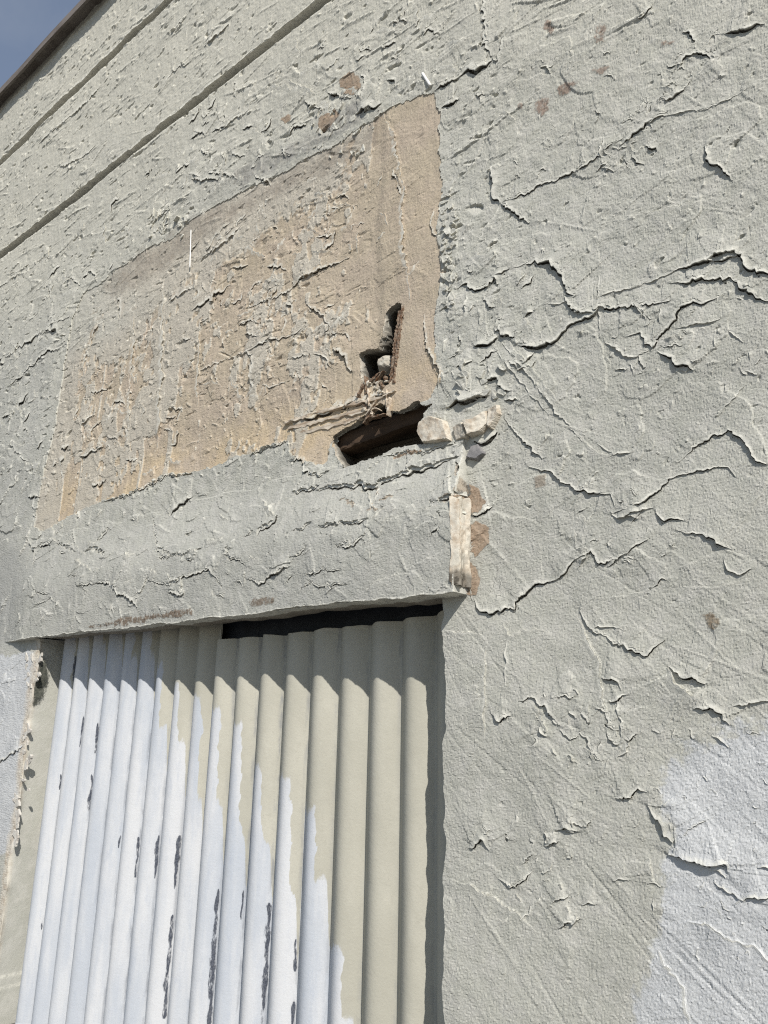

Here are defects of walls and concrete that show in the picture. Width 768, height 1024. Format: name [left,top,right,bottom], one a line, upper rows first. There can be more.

crack [474,21,765,246]
peeling [10,6,536,596]
spalling [0,341,38,428]
crack [0,57,768,763]
peeling [24,653,43,688]
spalling [528,689,636,765]
peeling [12,723,33,847]
spalling [560,818,591,859]
spalling [711,863,738,878]
peeling [162,915,173,1018]
peeling [207,889,219,1024]
peeling [262,903,272,1009]